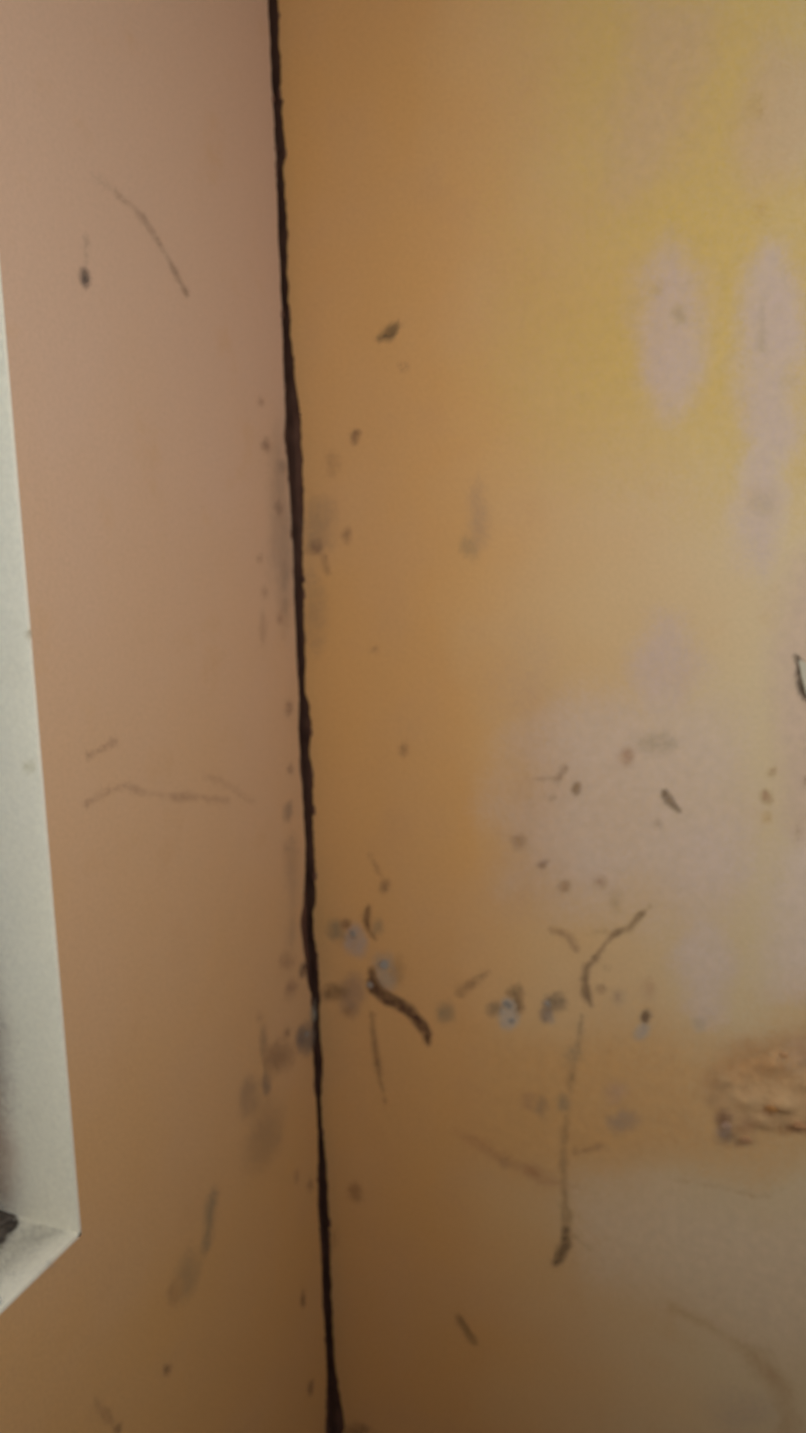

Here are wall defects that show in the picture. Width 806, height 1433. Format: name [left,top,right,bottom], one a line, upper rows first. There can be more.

crack [268,0,345,1433]
peeling [789,653,806,702]
crack [360,902,434,1103]
crack [547,904,652,1268]